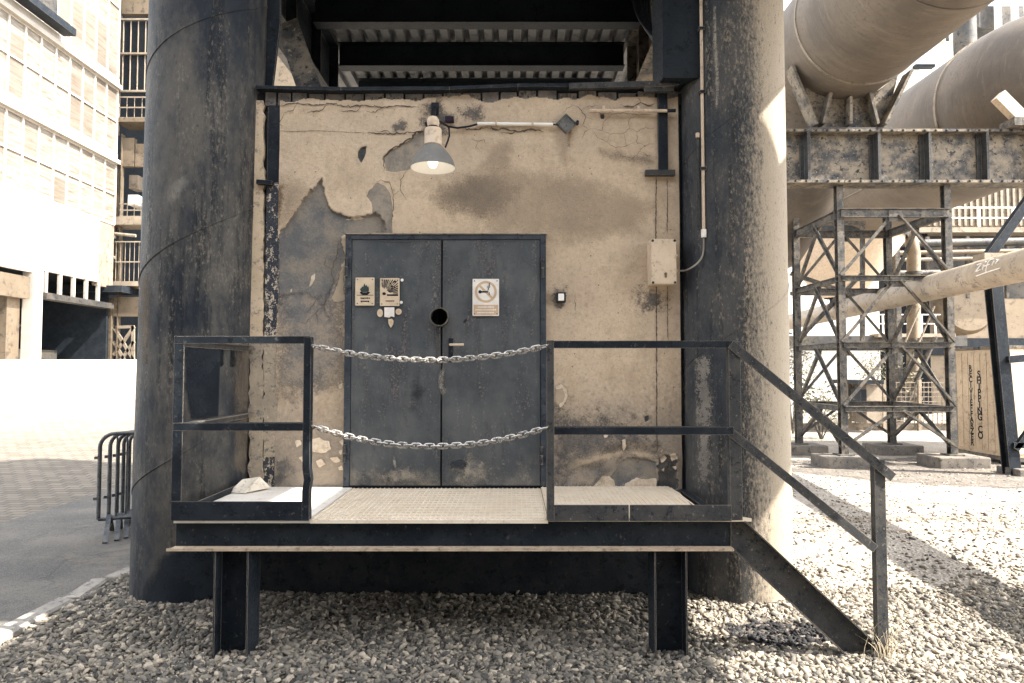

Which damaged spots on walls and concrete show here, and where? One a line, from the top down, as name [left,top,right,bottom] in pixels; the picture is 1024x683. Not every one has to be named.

crack [279,102,423,219]
flaking render [382,132,424,172]
crack [565,98,668,239]
flaking render [276,179,393,399]
crack [656,286,674,485]
peeling [295,437,343,470]
flaking render [561,449,679,490]